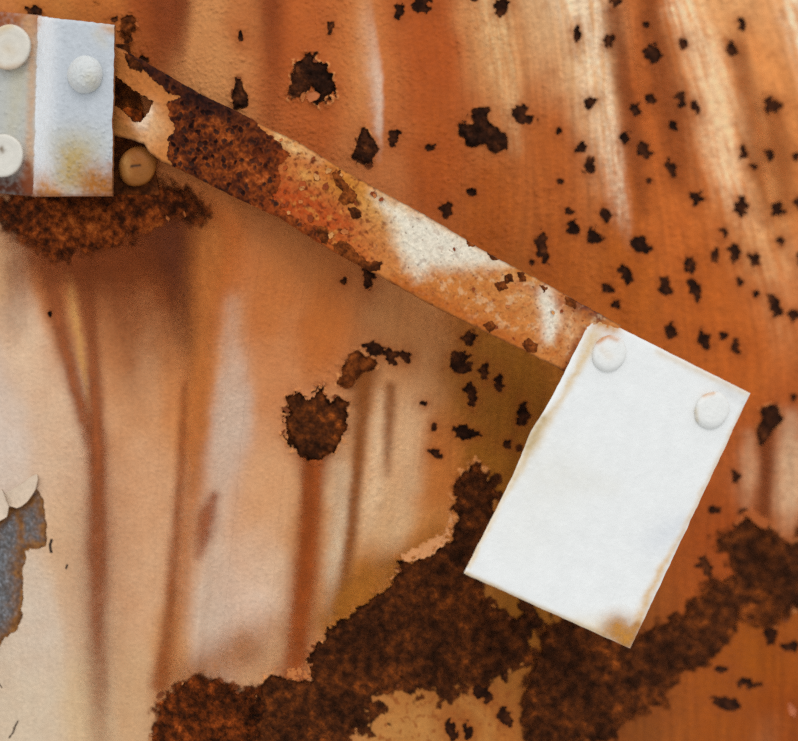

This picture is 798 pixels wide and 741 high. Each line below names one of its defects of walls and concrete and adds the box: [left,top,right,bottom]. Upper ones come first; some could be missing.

peeling [0,474,47,645]
corrosion [284,457,324,681]
corrosion [325,370,405,626]
corrosion [760,433,772,515]